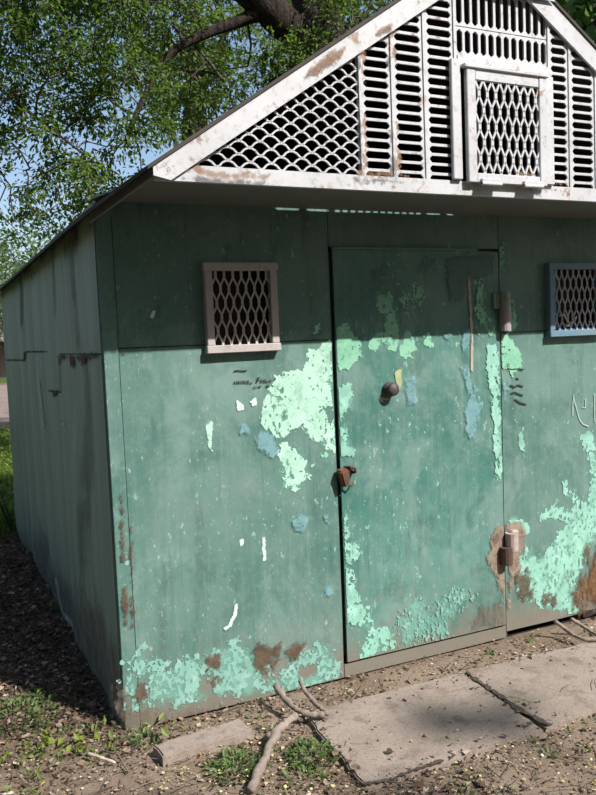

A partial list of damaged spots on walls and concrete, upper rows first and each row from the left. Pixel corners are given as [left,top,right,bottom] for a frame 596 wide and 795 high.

corrosion [307,47,345,76]
corrosion [358,114,406,179]
peeling [236,282,434,493]
peeling [472,277,523,481]
peeling [508,517,530,535]
peeling [513,431,596,614]
peeling [344,514,478,659]
corrosion [487,522,557,609]
corrosion [568,543,596,617]
corrosion [206,653,221,688]
peeling [116,634,343,712]
corrosion [252,641,307,674]